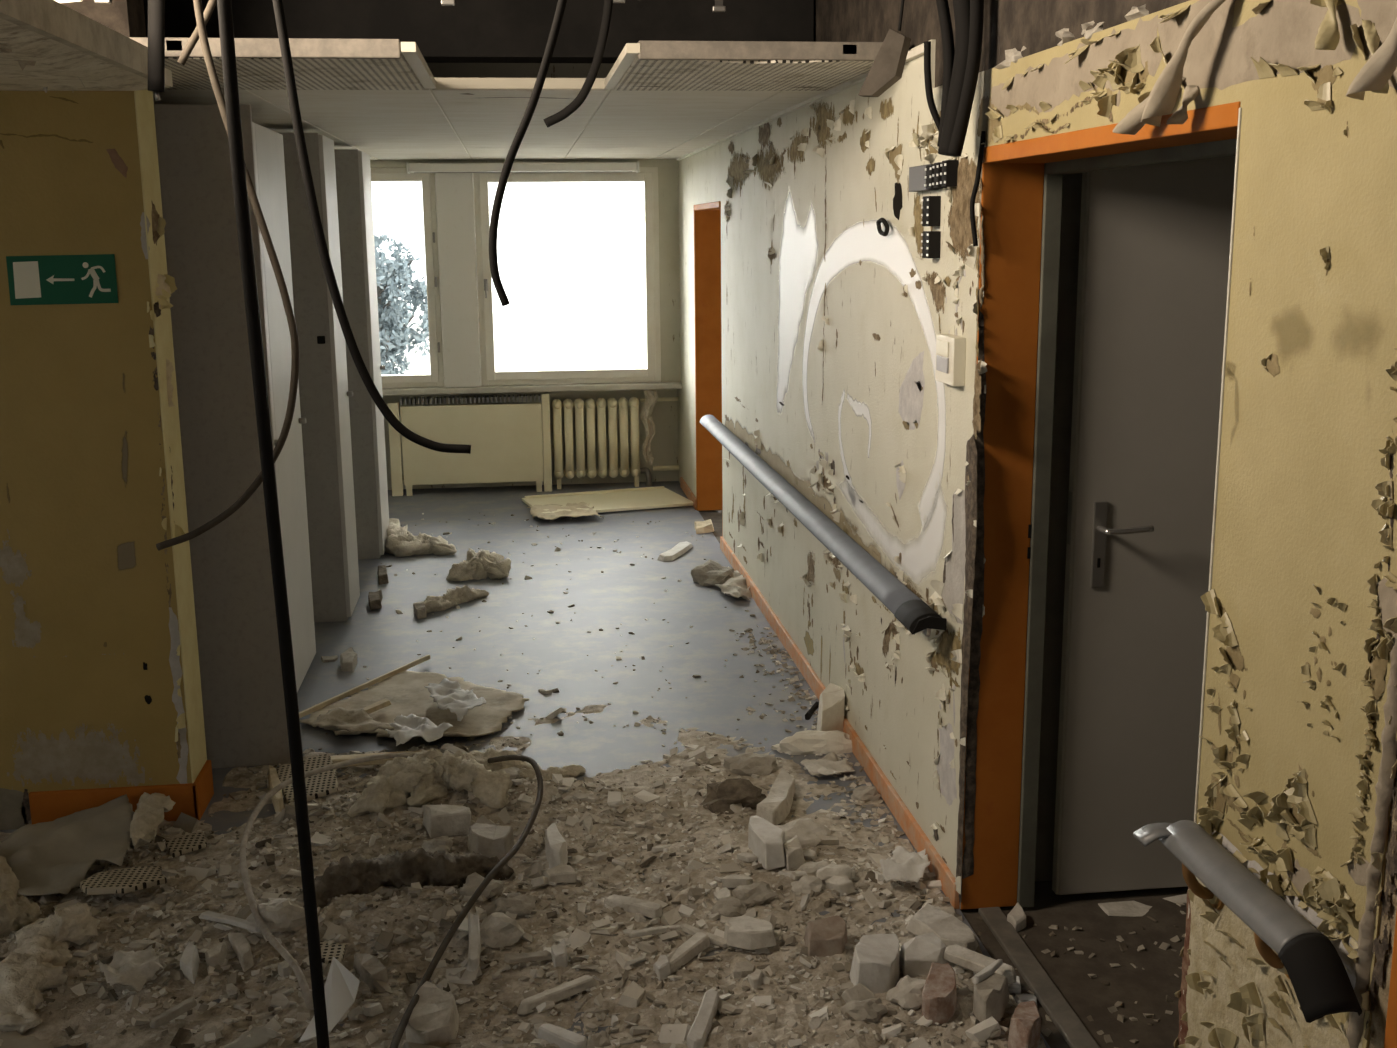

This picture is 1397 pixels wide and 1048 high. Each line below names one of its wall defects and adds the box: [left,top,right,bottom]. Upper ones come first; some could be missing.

spalling [140,202,166,259]
spalling [147,274,188,784]
peeling [723,0,1397,902]
spalling [1174,572,1397,1048]